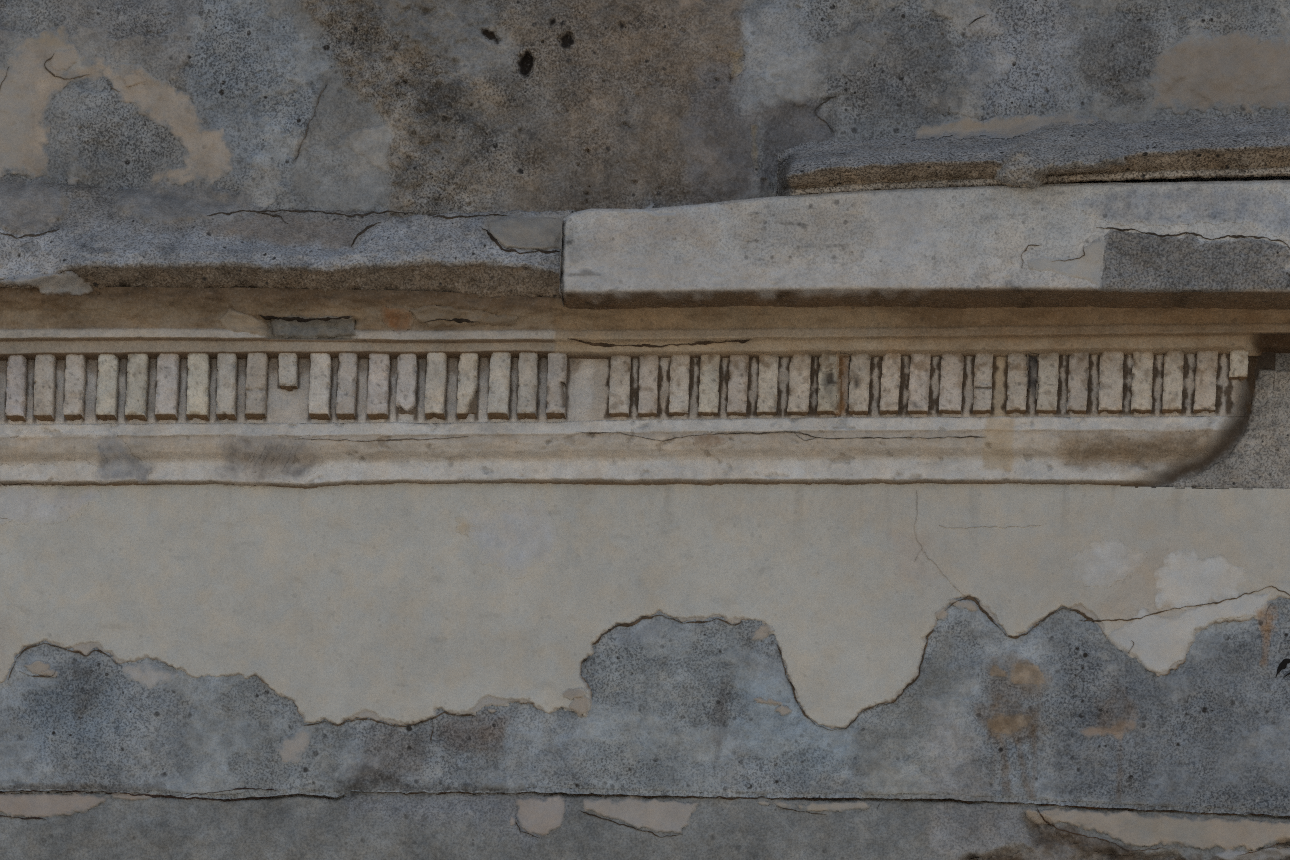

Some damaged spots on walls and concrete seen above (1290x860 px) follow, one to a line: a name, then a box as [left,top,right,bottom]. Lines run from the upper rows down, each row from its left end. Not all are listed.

crack [44,54,120,92]
peeling [0,25,234,187]
crack [208,209,560,254]
crack [1021,227,1290,265]
crack [777,492,1290,730]
spalling [0,547,1290,860]
crack [0,787,1290,855]